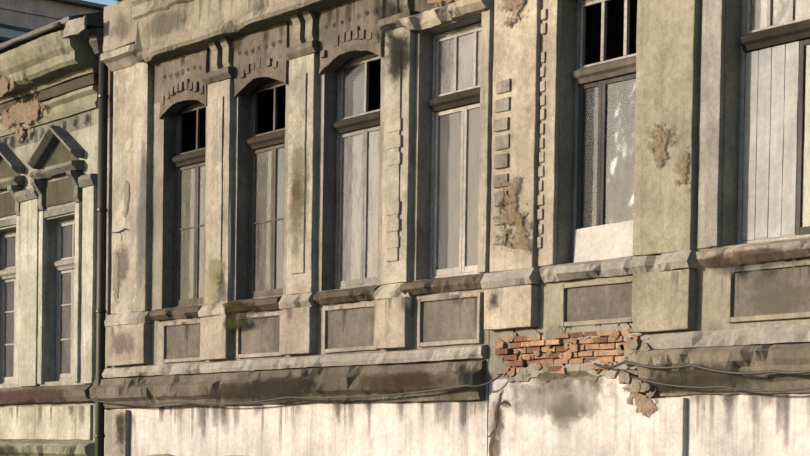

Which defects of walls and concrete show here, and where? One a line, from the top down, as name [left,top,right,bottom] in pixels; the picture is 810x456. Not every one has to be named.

flaking render [498,0,526,28]
flaking render [0,75,14,97]
flaking render [1,97,44,142]
flaking render [493,176,532,261]
water stain [210,376,316,400]
flaking render [488,323,660,418]
water stain [649,365,755,393]
crack [488,390,511,456]